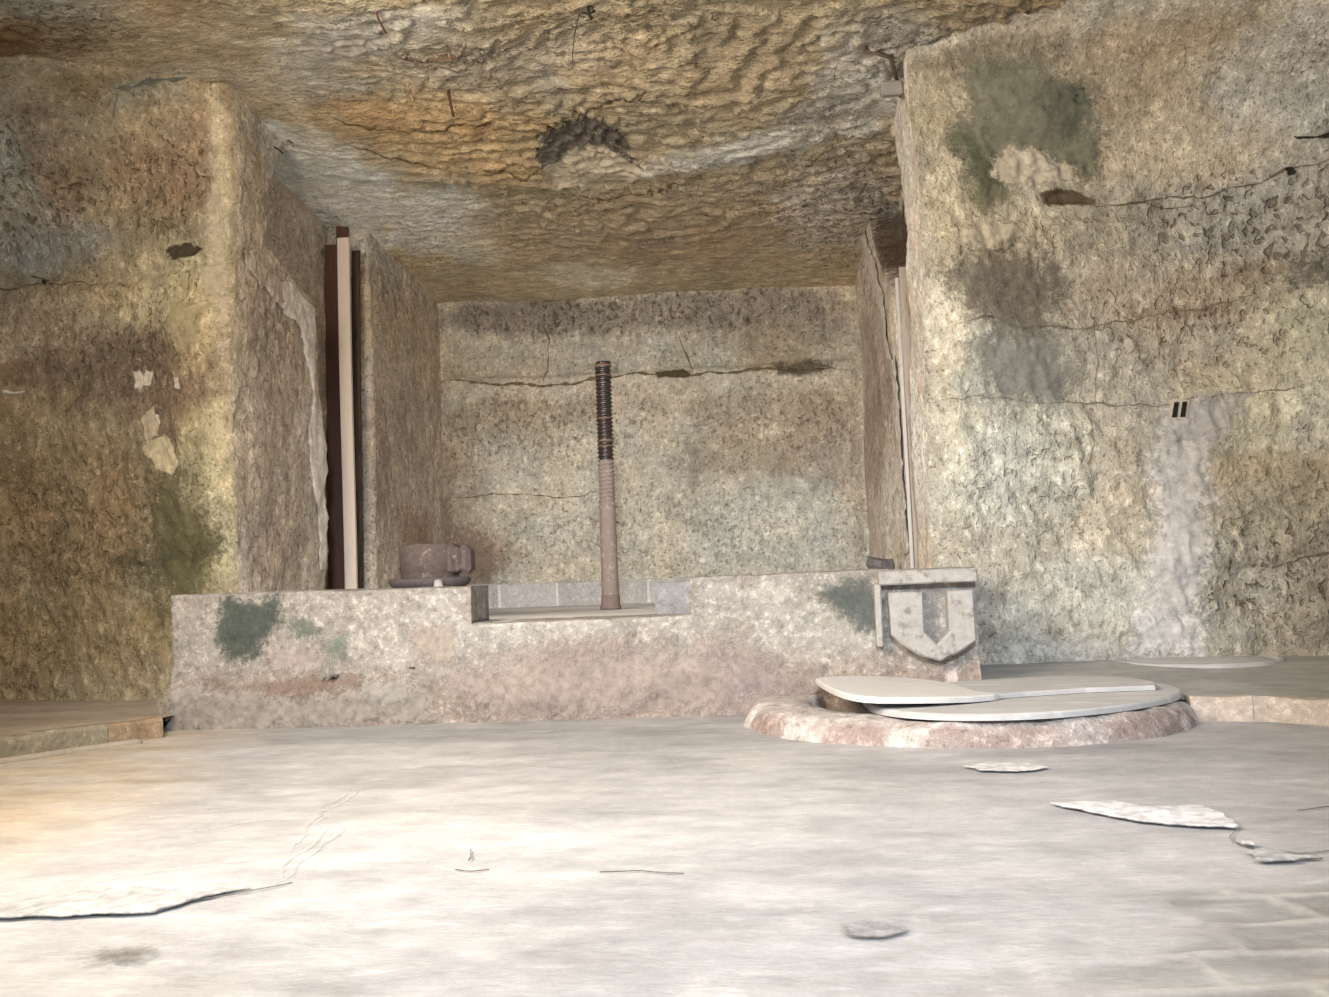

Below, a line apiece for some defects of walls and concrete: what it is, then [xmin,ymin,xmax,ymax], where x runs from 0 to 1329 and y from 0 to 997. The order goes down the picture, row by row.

spalling [537,115,641,191]
water stain [952,131,1008,214]
crack [1096,132,1329,209]
crack [0,276,103,291]
peeling [144,151,235,410]
crack [441,327,851,388]
peeling [140,406,179,475]
peeling [244,249,329,571]
spalling [1049,800,1318,861]